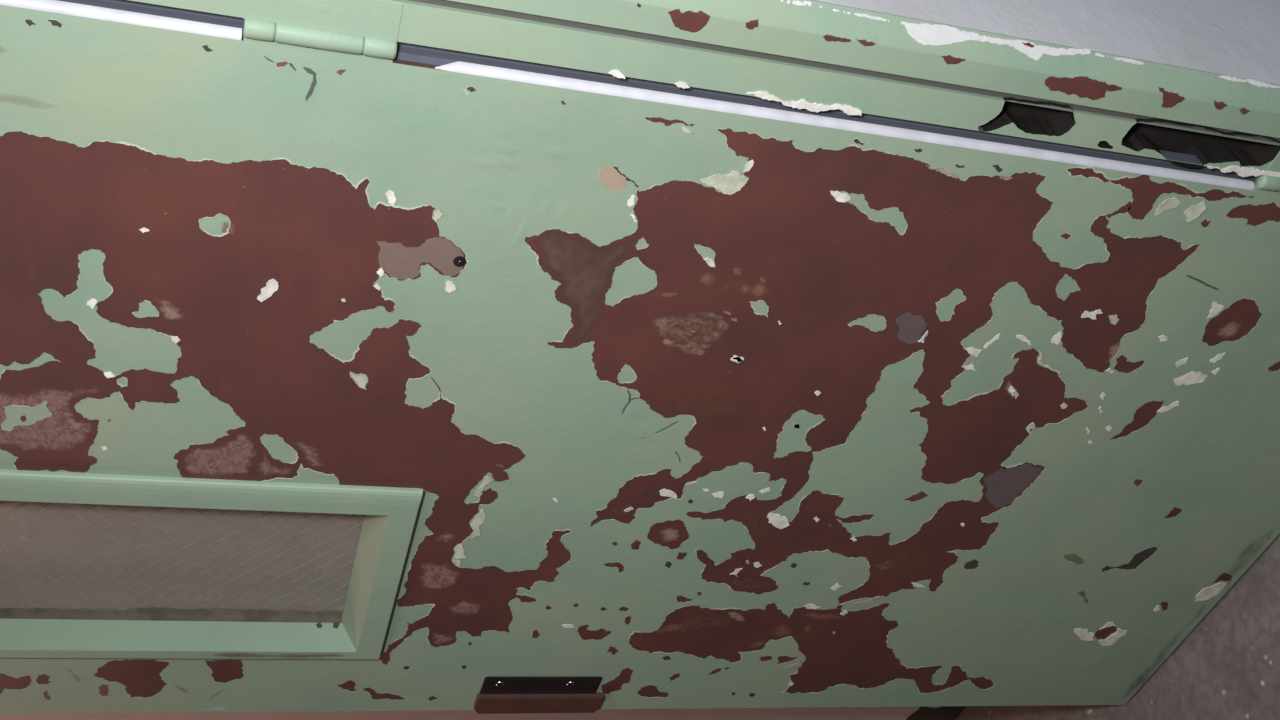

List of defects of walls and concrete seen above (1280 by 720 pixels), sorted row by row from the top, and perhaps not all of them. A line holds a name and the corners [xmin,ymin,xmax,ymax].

peeling [780,0,1144,65]
peeling [1045,76,1122,100]
peeling [1158,87,1185,108]
peeling [1214,100,1250,115]
peeling [1219,75,1280,88]
peeling [644,116,696,134]
peeling [0,130,573,670]
peeling [522,127,1280,720]
peeling [0,673,54,700]
peeling [93,659,170,698]
peeling [204,659,244,684]
peeling [338,680,410,701]